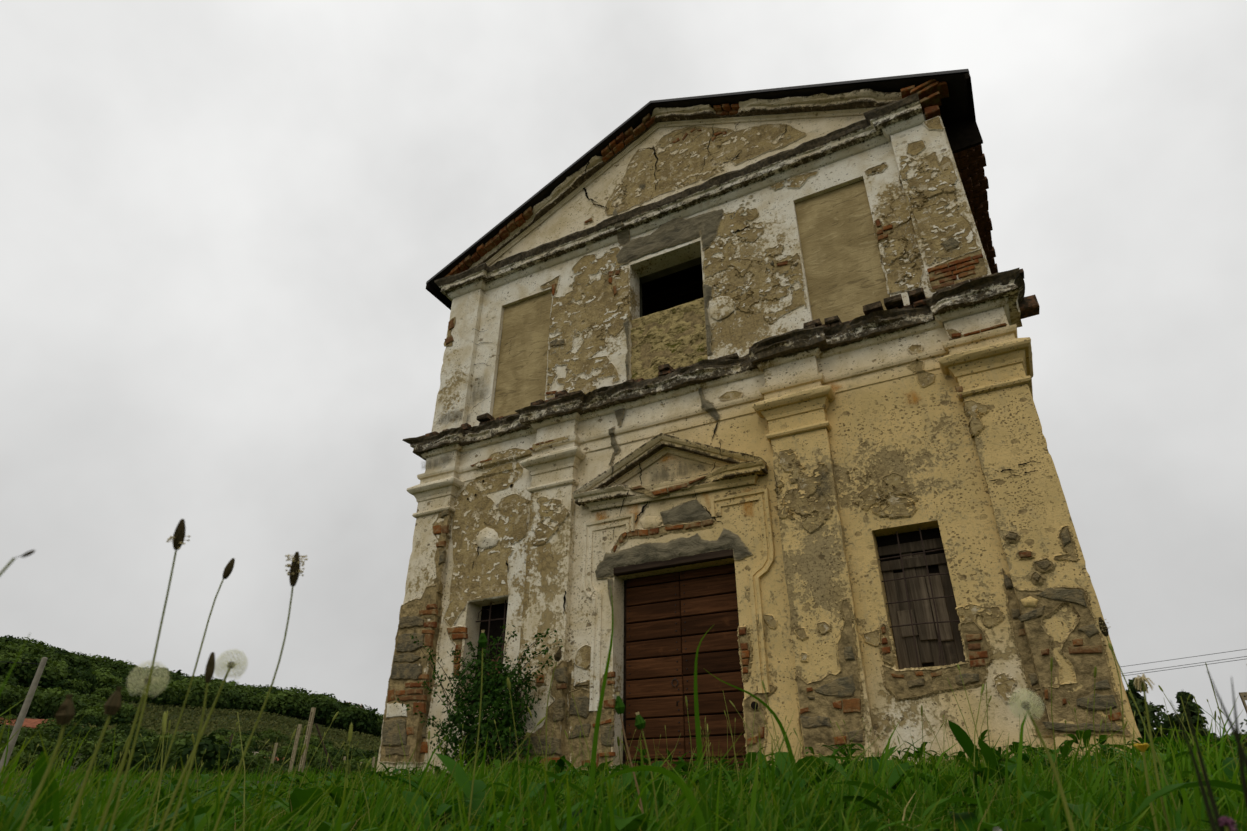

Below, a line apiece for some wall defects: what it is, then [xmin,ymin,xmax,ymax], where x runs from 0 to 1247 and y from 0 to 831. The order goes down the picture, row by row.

flaking render [540,246,631,399]
flaking render [584,123,808,225]
flaking render [702,195,807,325]
flaking render [769,171,819,191]
flaking render [864,116,988,295]
flaking render [379,435,570,765]
spalling [737,625,777,763]
spalling [793,525,1133,760]